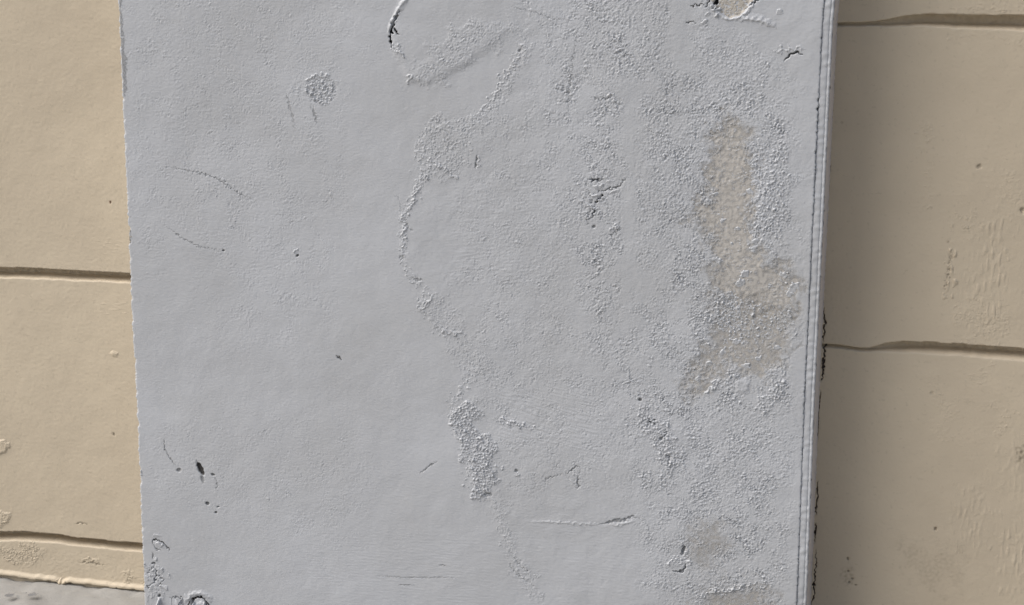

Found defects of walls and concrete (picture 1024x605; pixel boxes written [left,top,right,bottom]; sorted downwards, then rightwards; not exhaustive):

crack [387,0,409,55]
peeling [578,0,804,523]